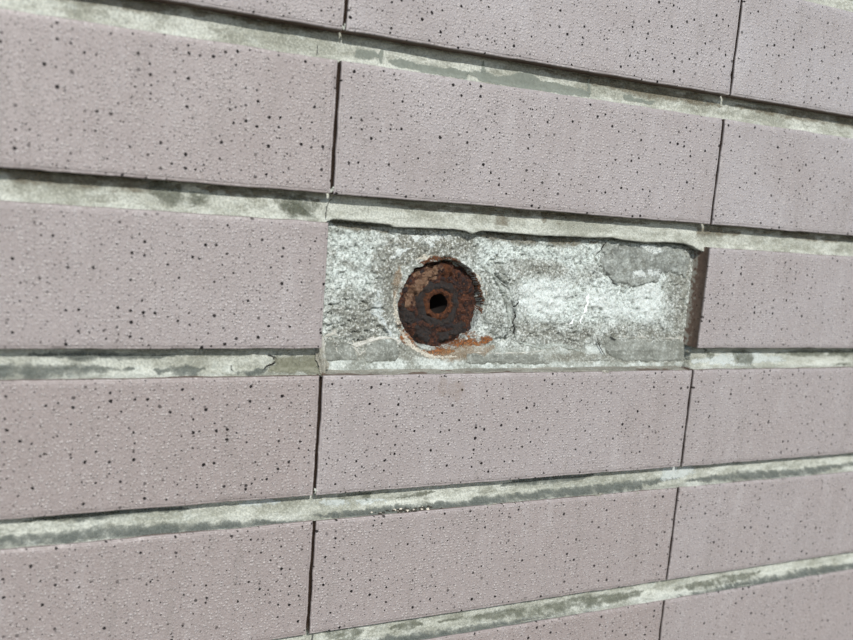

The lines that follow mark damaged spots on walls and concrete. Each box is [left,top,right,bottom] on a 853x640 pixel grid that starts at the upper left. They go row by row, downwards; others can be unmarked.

corrosion [397,292,493,356]
corrosion [420,256,485,314]
spalling [318,219,694,371]